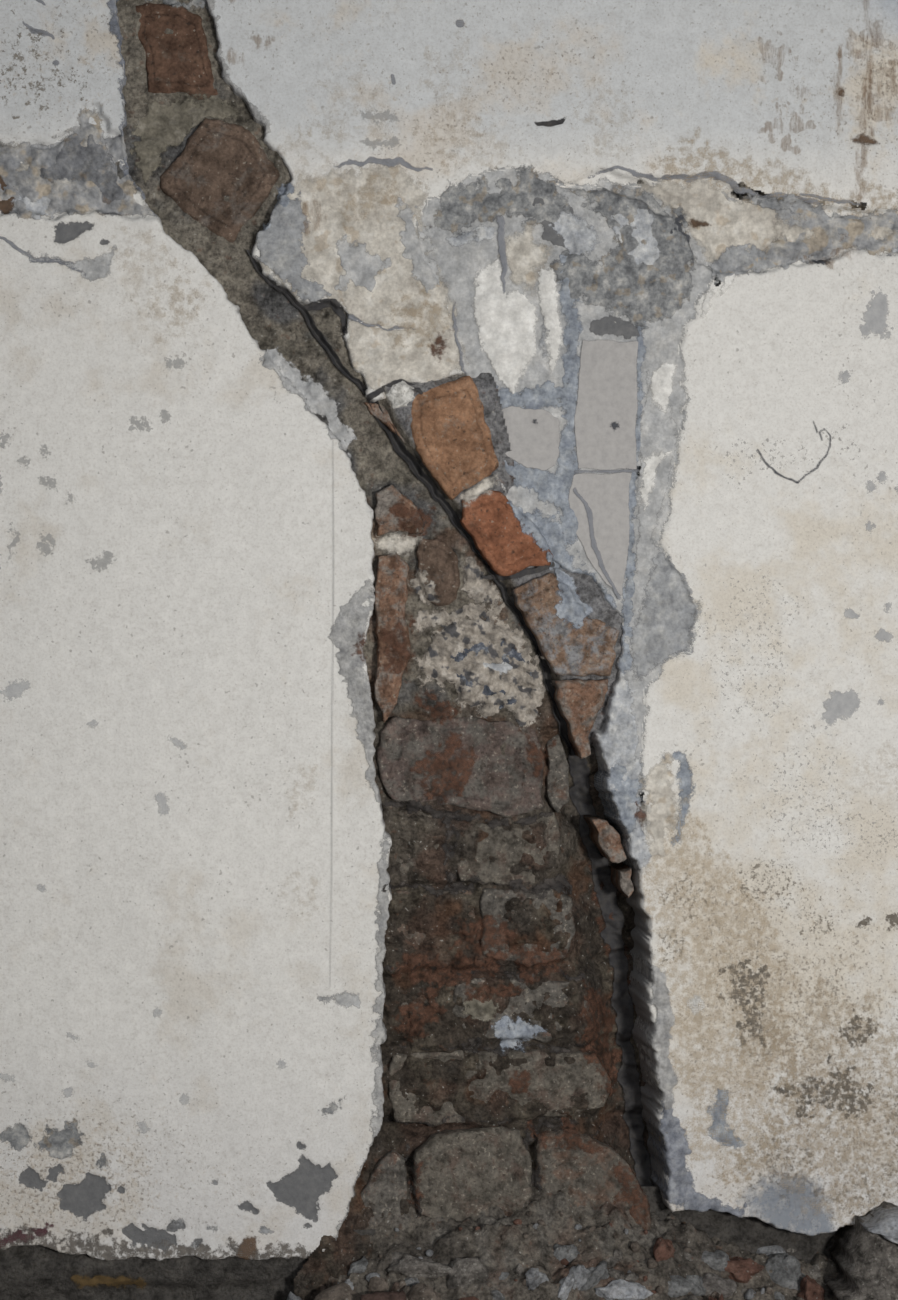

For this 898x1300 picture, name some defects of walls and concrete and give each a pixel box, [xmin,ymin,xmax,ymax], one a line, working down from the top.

peeling [54,221,94,244]
spalling [0,108,158,220]
crack [589,166,860,205]
crack [758,422,831,483]
spalling [107,0,747,1300]
crack [246,250,654,1187]
peeling [822,689,860,729]
water stain [857,913,898,931]
water stain [718,951,771,1048]
water stain [839,1004,879,1047]
peeling [0,1118,126,1222]
water stain [738,1054,898,1234]